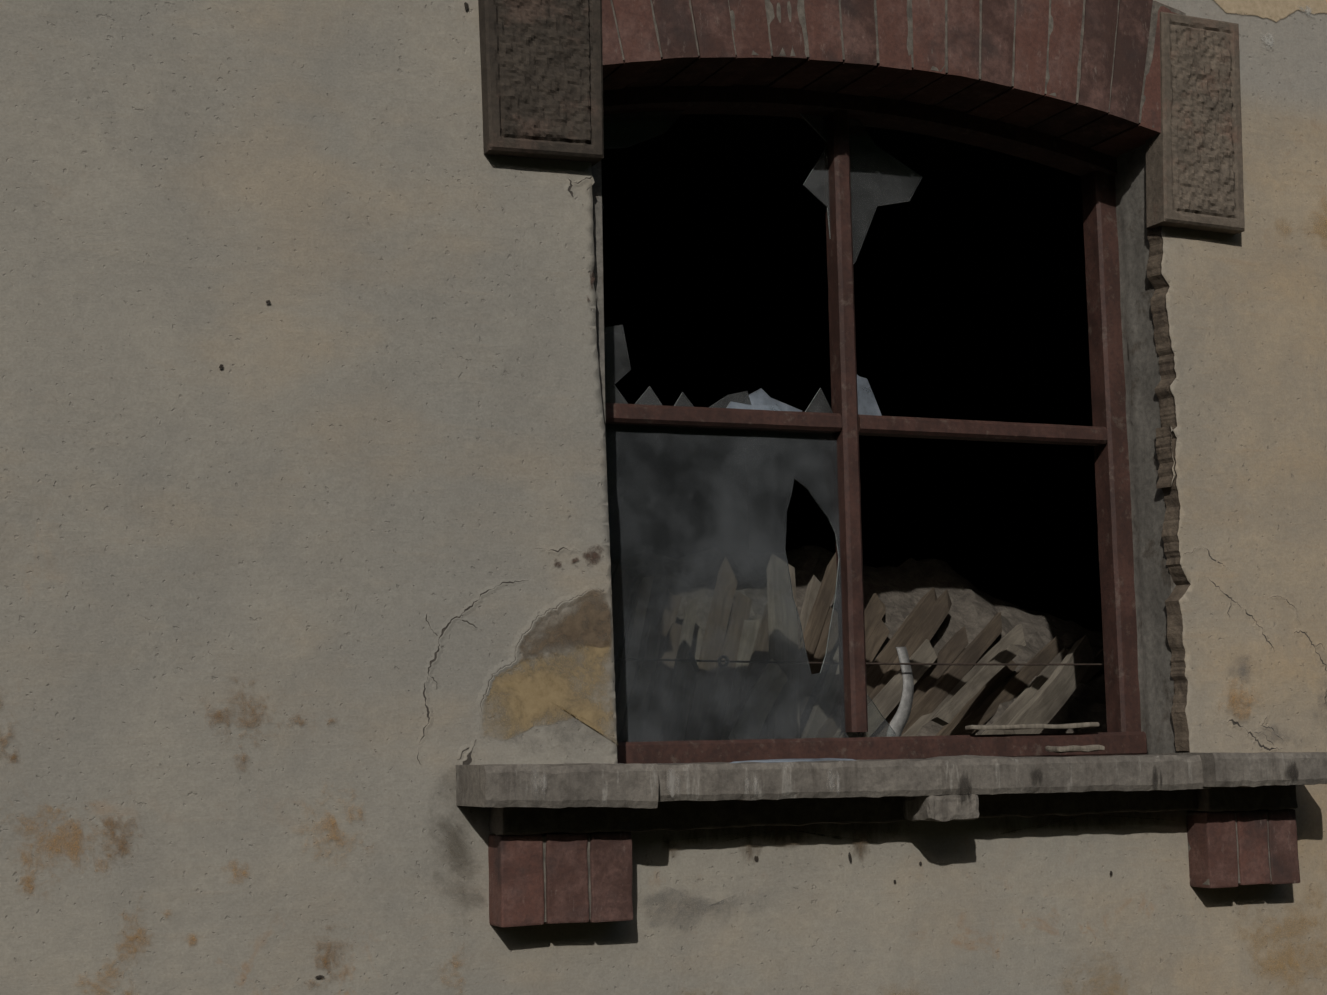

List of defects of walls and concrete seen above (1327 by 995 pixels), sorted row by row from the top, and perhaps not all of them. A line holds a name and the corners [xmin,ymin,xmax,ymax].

peeling [1214,0,1327,47]
crack [416,579,530,765]
crack [1183,544,1327,705]
crack [1222,712,1288,752]